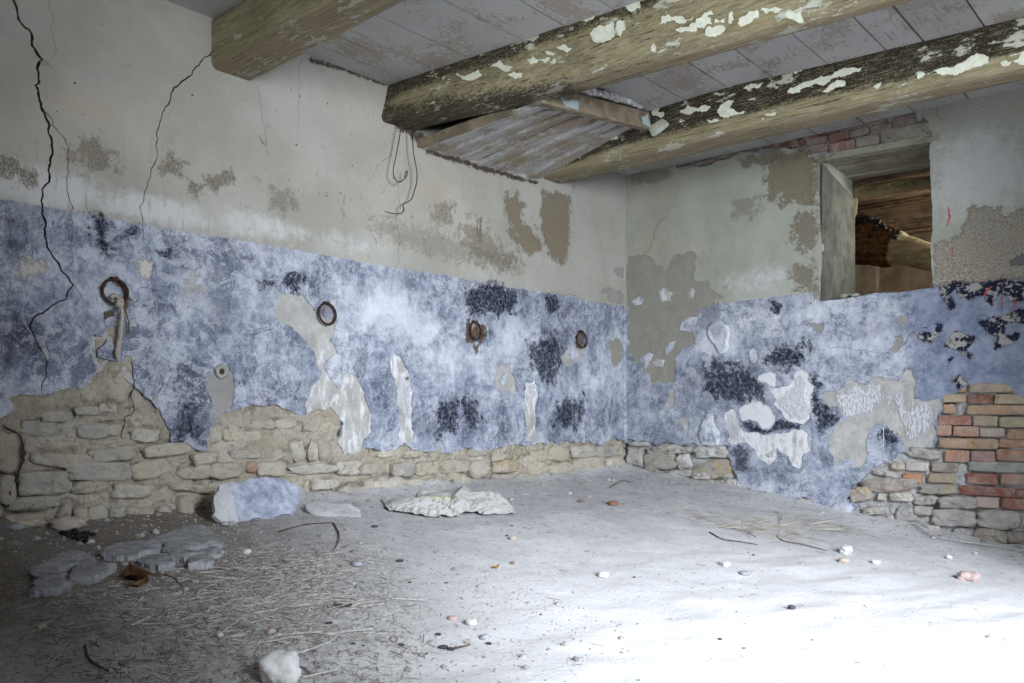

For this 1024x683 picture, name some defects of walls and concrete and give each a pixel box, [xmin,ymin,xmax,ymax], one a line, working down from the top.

peeling [660,7,804,37]
peeling [787,67,861,94]
peeling [917,51,1024,79]
crack [0,0,86,392]
crack [125,52,212,321]
rust [98,276,132,320]
damp [464,280,526,319]
rust [465,319,488,353]
damp [522,295,586,441]
damp [429,390,484,441]
spalling [0,293,1024,549]
damp [702,335,935,472]